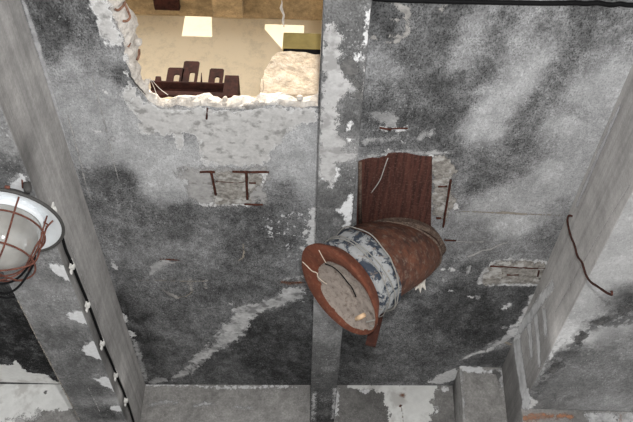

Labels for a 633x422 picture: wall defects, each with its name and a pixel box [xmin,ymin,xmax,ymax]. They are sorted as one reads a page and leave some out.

damp [22,0,74,163]
peeling [89,0,459,228]
damp [362,112,409,145]
spalling [478,257,547,287]
damp [132,339,297,390]
peeling [345,368,458,422]